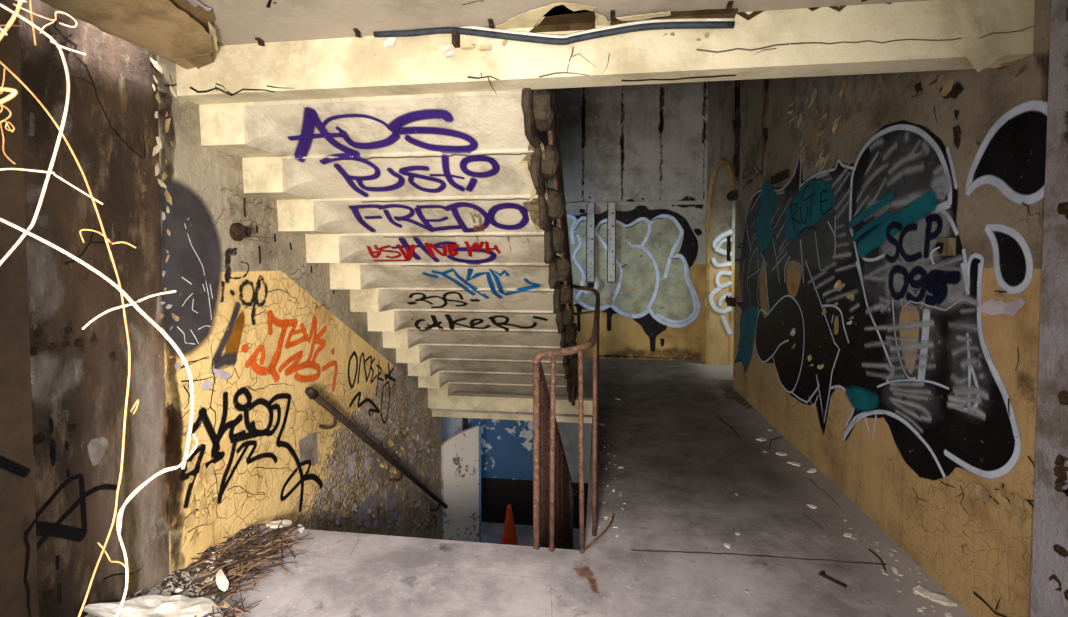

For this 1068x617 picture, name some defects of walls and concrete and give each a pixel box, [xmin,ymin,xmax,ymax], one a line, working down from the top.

crack [737,11,763,20]
crack [808,4,847,12]
spalling [44,26,71,54]
crack [696,25,1034,55]
spalling [519,141,549,232]
peeling [1058,390,1068,405]
peeling [1053,454,1068,497]
crack [913,482,1034,514]
peeling [1053,544,1068,559]
peeling [1048,575,1068,601]